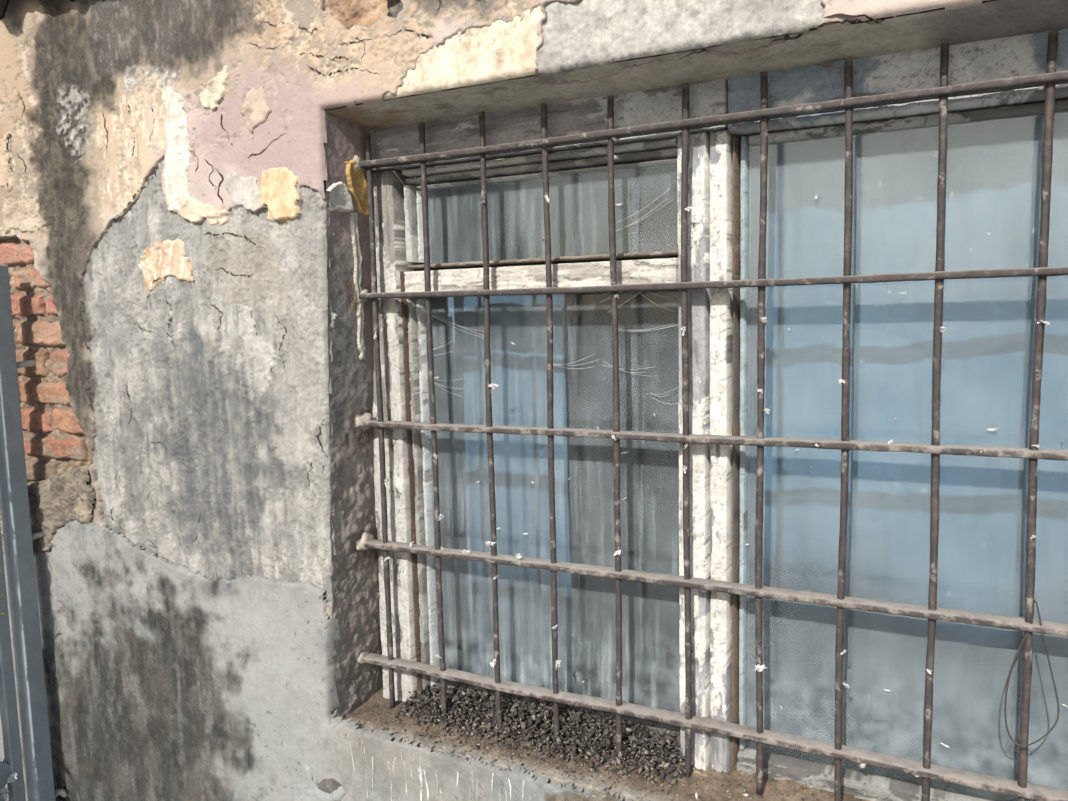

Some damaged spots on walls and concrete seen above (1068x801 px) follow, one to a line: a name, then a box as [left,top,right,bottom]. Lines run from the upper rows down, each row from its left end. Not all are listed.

leakage [26,0,263,433]
peeling [199,65,234,148]
peeling [263,0,825,100]
peeling [0,86,374,604]
leakage [163,328,272,553]
leakage [80,564,112,588]
leakage [42,577,254,801]
leakage [547,790,615,801]